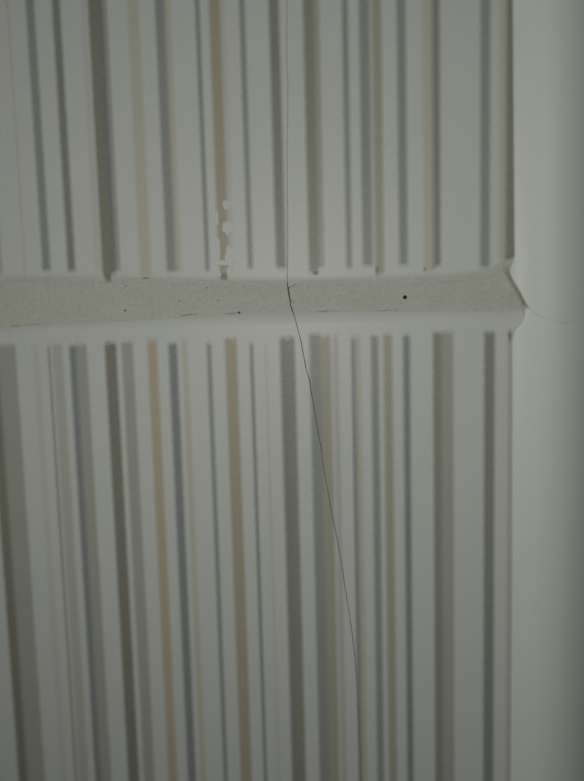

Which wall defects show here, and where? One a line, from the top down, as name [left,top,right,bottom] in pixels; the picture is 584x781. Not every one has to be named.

crack [286,0,360,745]